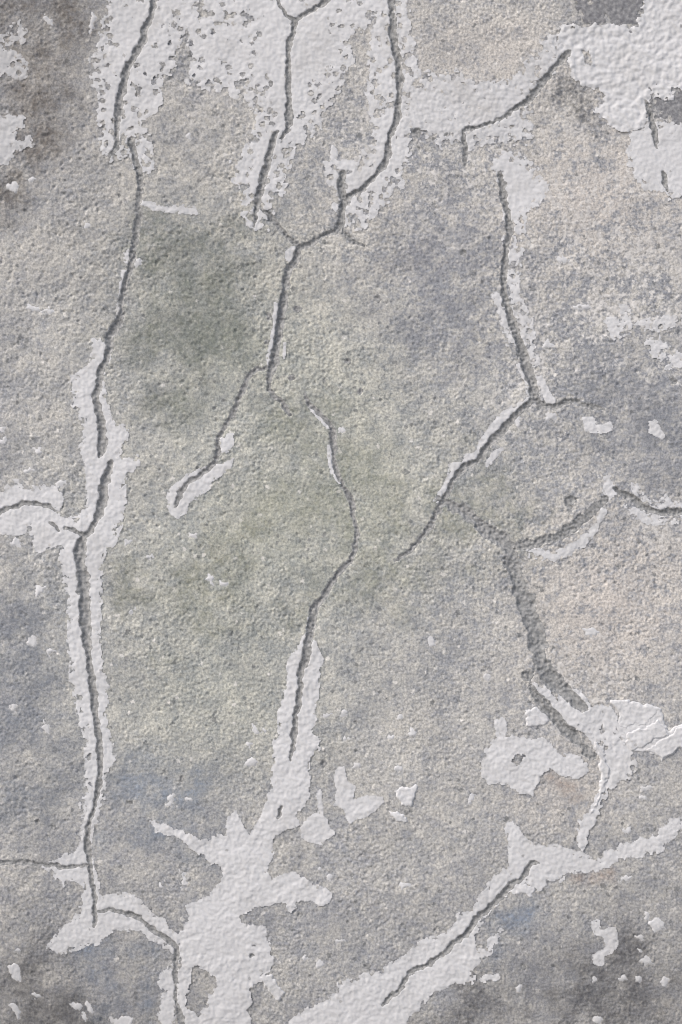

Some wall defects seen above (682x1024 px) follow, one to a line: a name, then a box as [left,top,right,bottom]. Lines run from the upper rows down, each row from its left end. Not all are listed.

crack [0,0,185,1024]
peeling [0,249,418,1024]
crack [174,0,405,761]
peeling [88,0,682,504]
crack [381,860,540,1007]
peeling [289,670,682,1024]
crack [461,49,571,167]
crack [394,171,682,761]
crack [644,100,668,192]